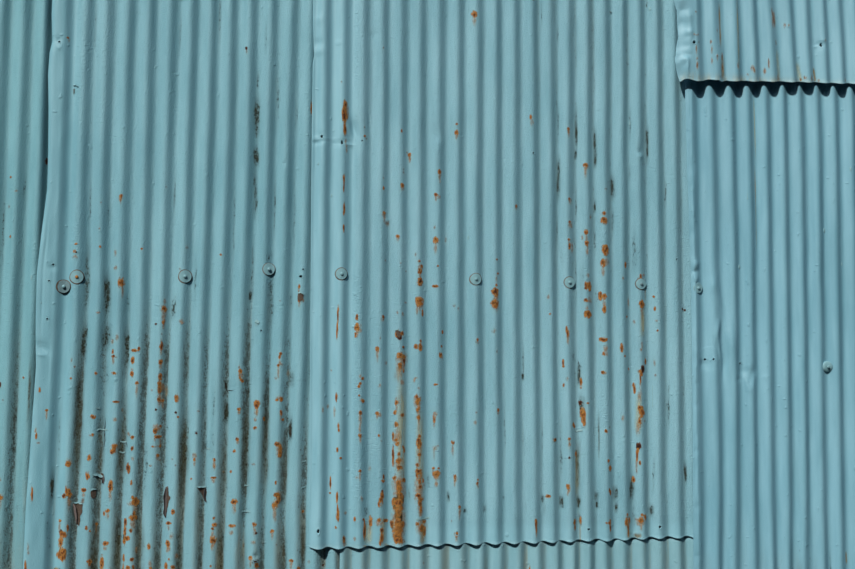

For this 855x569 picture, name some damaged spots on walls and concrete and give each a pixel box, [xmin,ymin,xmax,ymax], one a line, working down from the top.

rust [584,281,607,318]
rust [395,329,422,372]
rust [155,342,179,418]
rust [572,400,589,428]
rust [62,473,90,498]
rust [415,434,441,536]
rust [56,519,69,562]
rust [122,496,140,569]